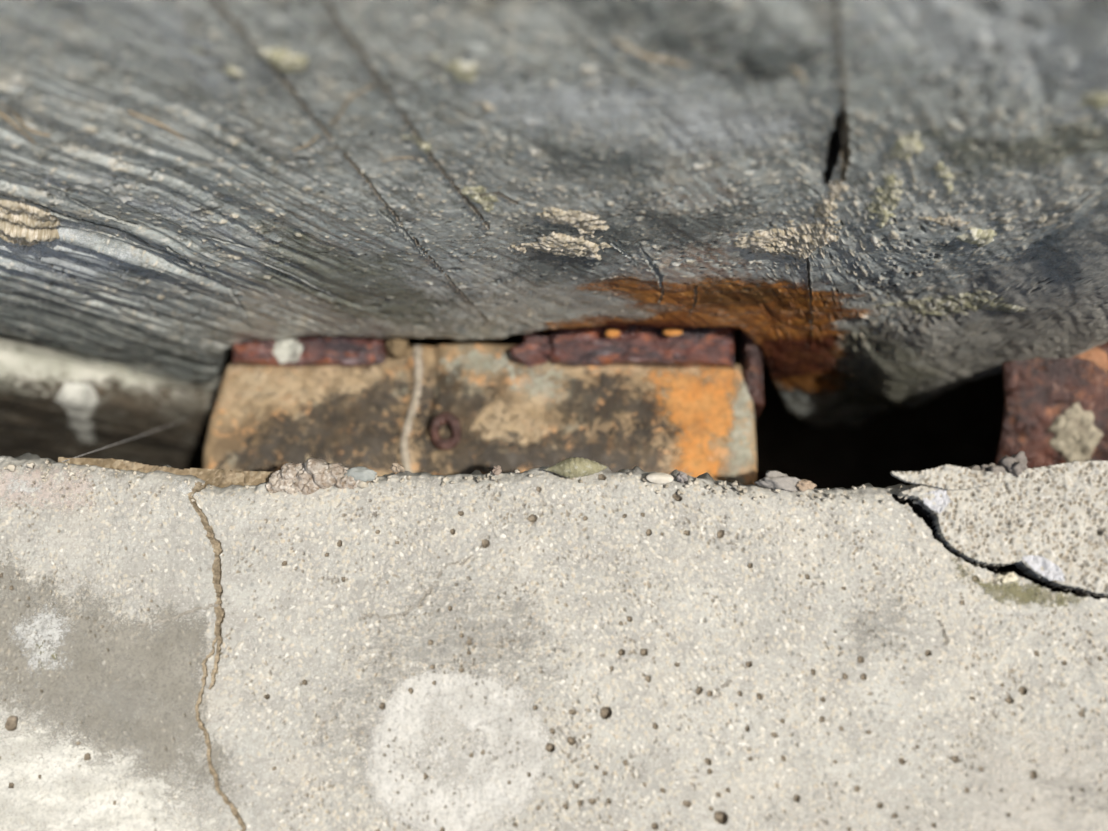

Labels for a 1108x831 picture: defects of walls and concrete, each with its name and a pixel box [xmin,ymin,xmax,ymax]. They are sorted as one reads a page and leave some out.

crack [833,0,846,109]
crack [211,0,519,324]
rust [232,335,388,367]
rust [509,277,872,479]
rust [995,342,1108,468]
crack [892,489,1108,600]
damp [0,559,229,831]
crack [137,482,246,831]